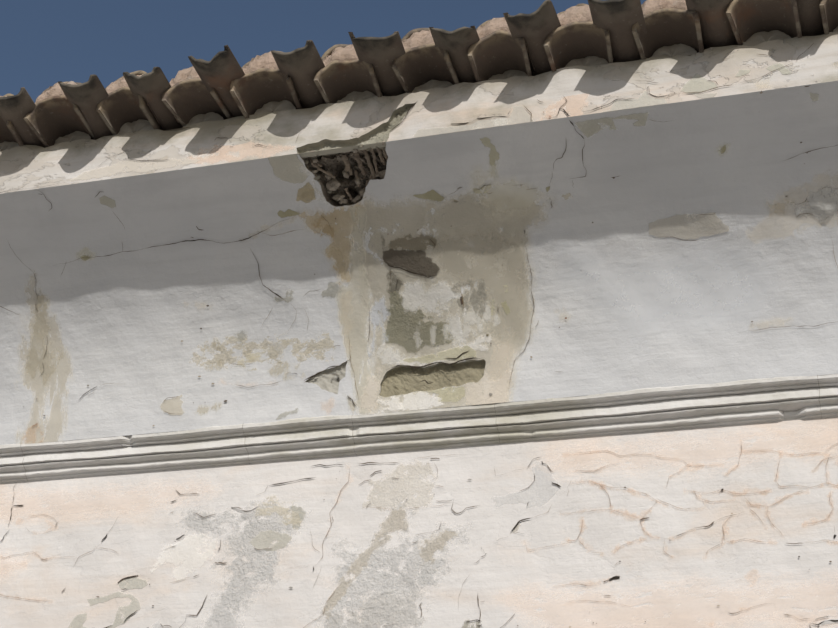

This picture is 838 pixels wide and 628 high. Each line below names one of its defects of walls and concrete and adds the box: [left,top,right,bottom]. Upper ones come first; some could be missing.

spalling [193,103,416,207]
damp [21,275,70,444]
crack [62,220,309,332]
peeling [192,333,351,394]
spalling [348,230,511,411]
peeling [649,213,729,241]
crack [0,446,117,560]
peeling [68,496,301,628]
crack [170,414,457,587]
peeling [307,462,479,628]
crack [458,443,838,605]
crack [717,603,838,628]